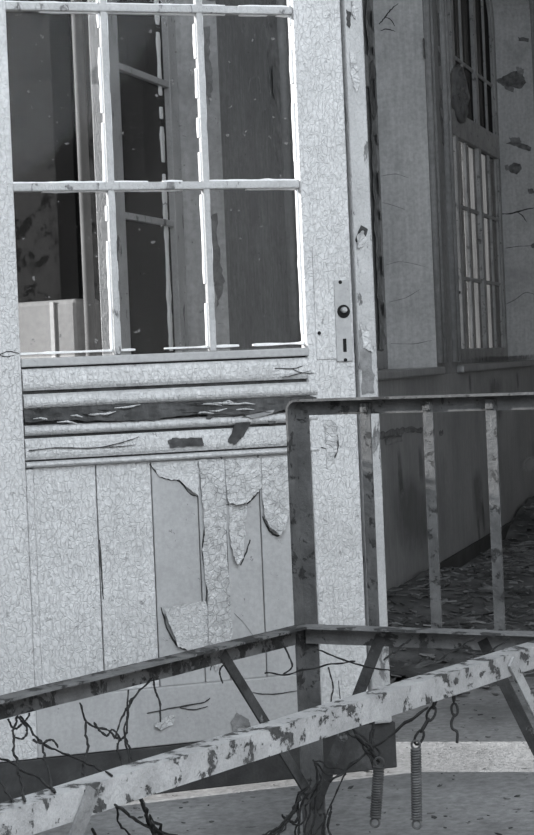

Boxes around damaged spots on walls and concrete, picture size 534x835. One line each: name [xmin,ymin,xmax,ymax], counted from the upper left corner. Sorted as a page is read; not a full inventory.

crack [379,4,398,31]
spalling [436,0,450,146]
spalling [497,67,526,92]
peeling [168,437,204,448]
crack [97,539,105,599]
peeling [149,456,289,650]